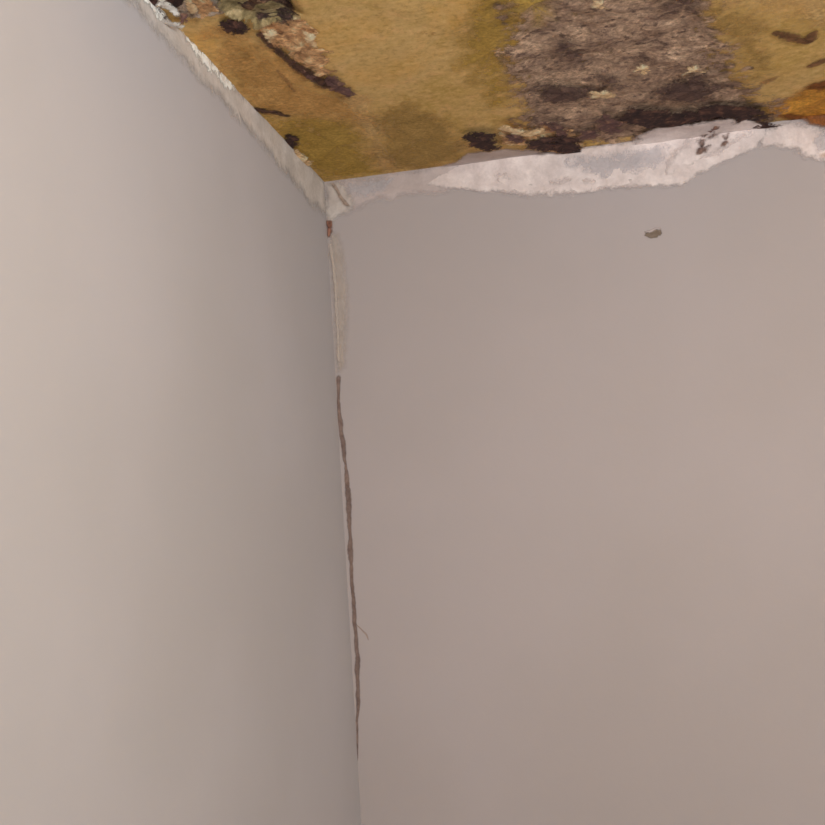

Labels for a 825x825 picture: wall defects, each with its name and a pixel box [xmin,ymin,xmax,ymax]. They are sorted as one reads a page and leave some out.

peeling [130,0,825,213]
leakage [461,0,788,148]
rust [768,81,825,126]
crack [336,376,368,758]